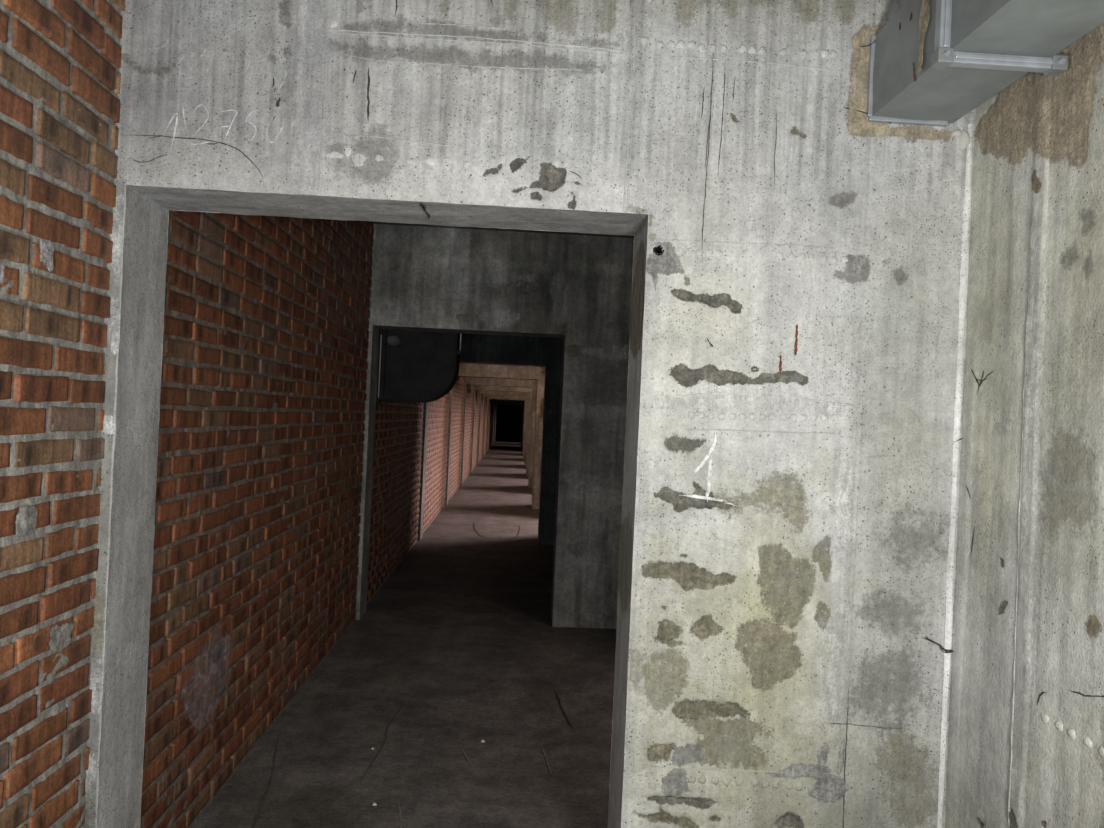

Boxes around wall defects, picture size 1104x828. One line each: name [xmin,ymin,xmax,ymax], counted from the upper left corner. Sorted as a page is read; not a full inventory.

spalling [470,158,527,176]
spalling [511,163,580,209]
spalling [671,288,743,314]
spalling [669,363,809,388]
damp [716,473,809,527]
damp [683,713,766,771]